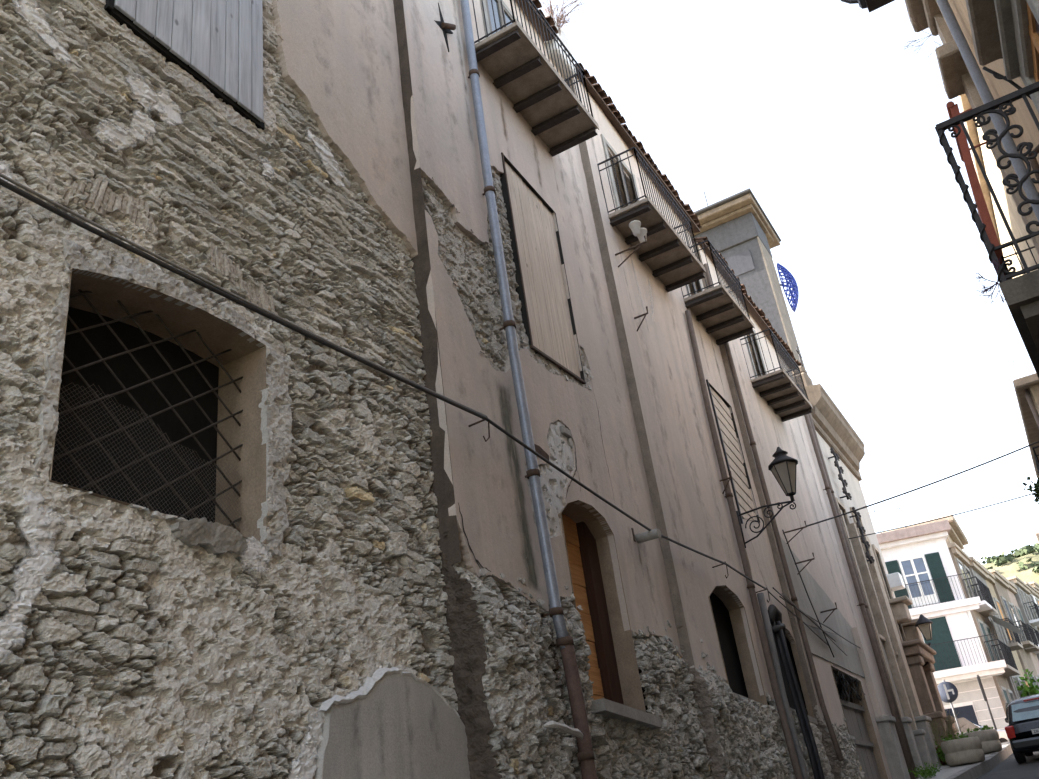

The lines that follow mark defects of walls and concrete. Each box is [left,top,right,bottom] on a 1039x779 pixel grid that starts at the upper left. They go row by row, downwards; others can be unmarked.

flaking render [422,167,527,372]
flaking render [525,421,574,538]